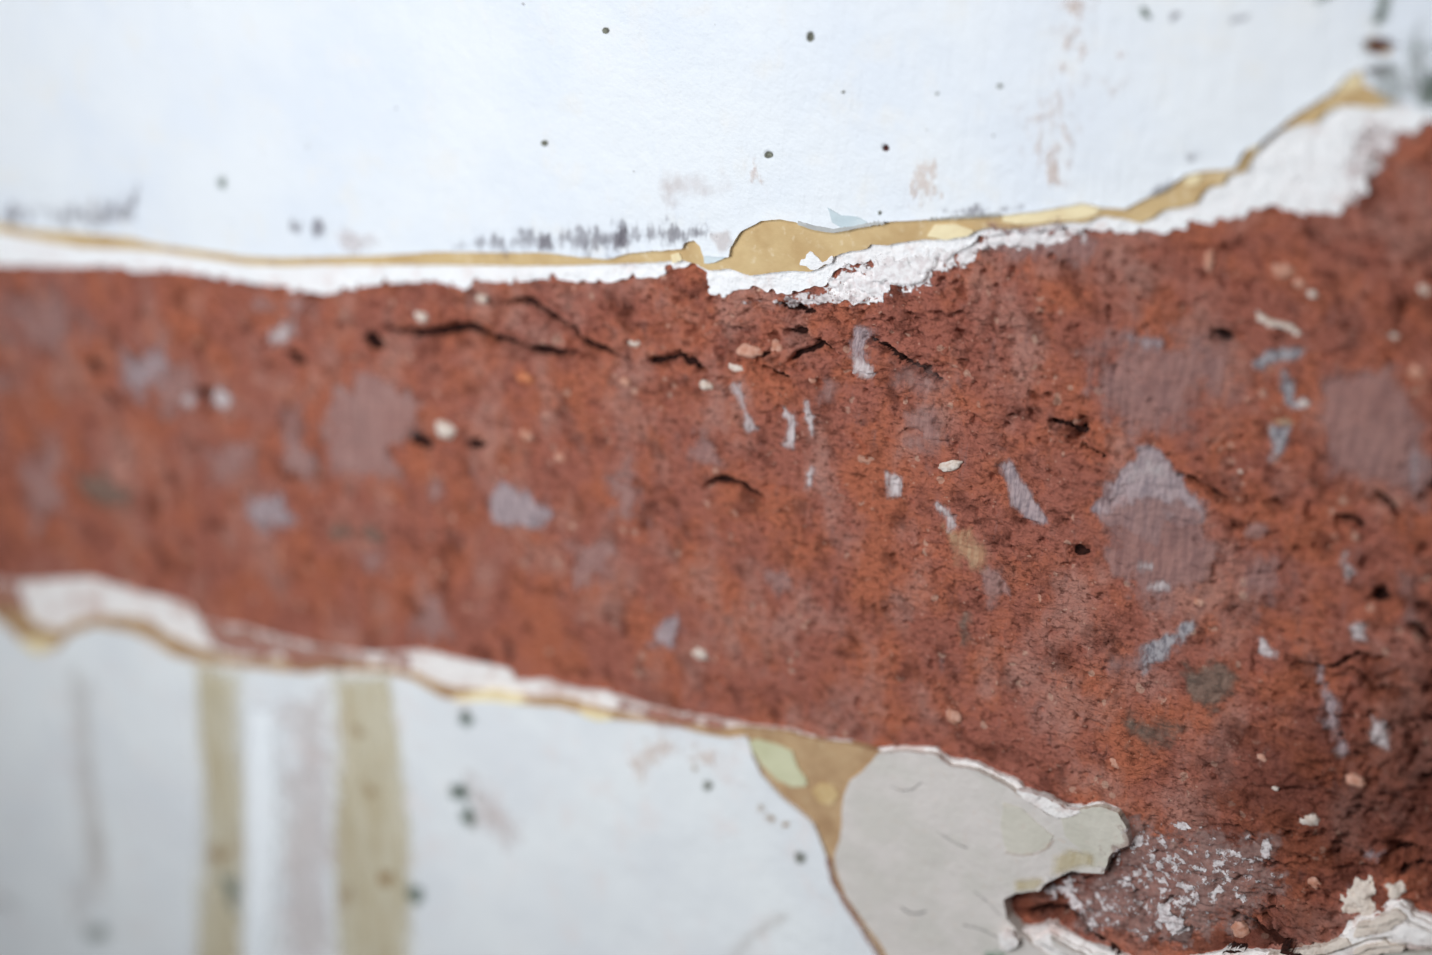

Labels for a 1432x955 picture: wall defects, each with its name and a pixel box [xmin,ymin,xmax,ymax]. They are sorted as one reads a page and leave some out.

spalling [986,70,1432,236]
spalling [0,224,726,295]
peeling [696,208,1000,298]
flaking render [156,364,196,403]
flaking render [736,342,764,359]
spalling [0,575,818,738]
water stain [199,670,242,955]
water stain [336,679,423,955]
peeling [732,724,886,955]
peeling [834,745,1132,955]
spalling [1195,943,1277,955]
peeling [1293,901,1432,955]